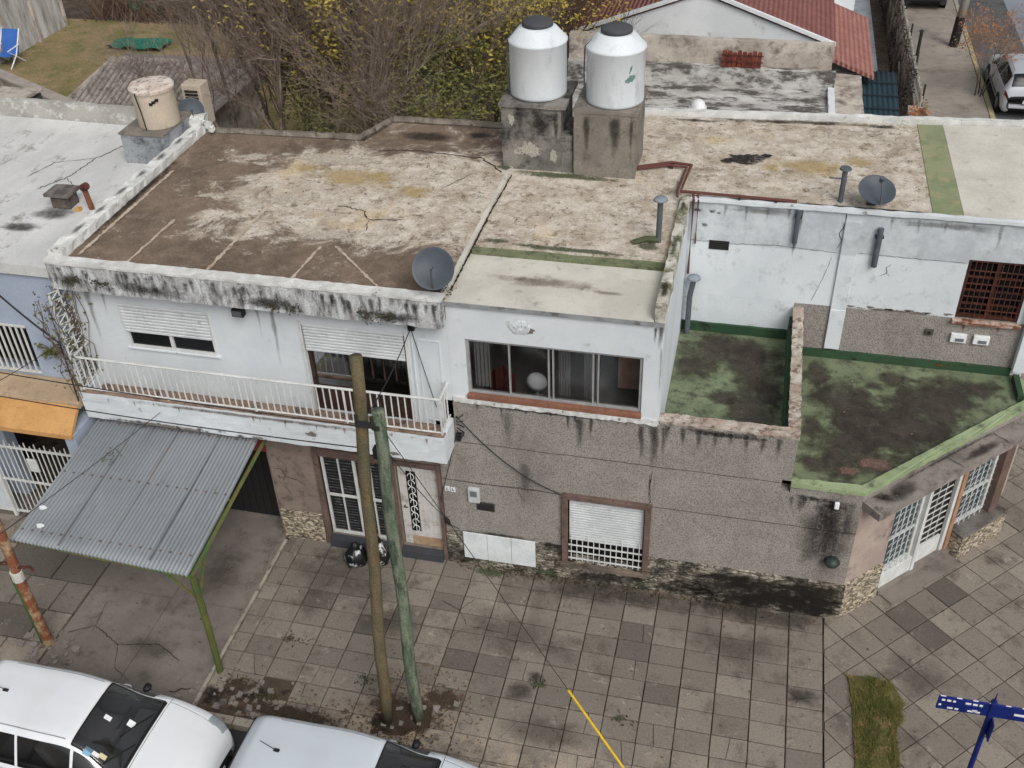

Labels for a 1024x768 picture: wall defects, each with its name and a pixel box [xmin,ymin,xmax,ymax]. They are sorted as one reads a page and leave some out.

damp [514,114,558,163]
crack [30,146,122,189]
crack [337,205,402,230]
crack [378,149,512,291]
damp [115,274,193,296]
damp [232,287,288,308]
damp [368,300,436,322]
damp [639,334,784,447]
damp [501,408,593,431]
damp [801,362,1001,480]
damp [537,570,841,626]
crack [70,602,179,681]